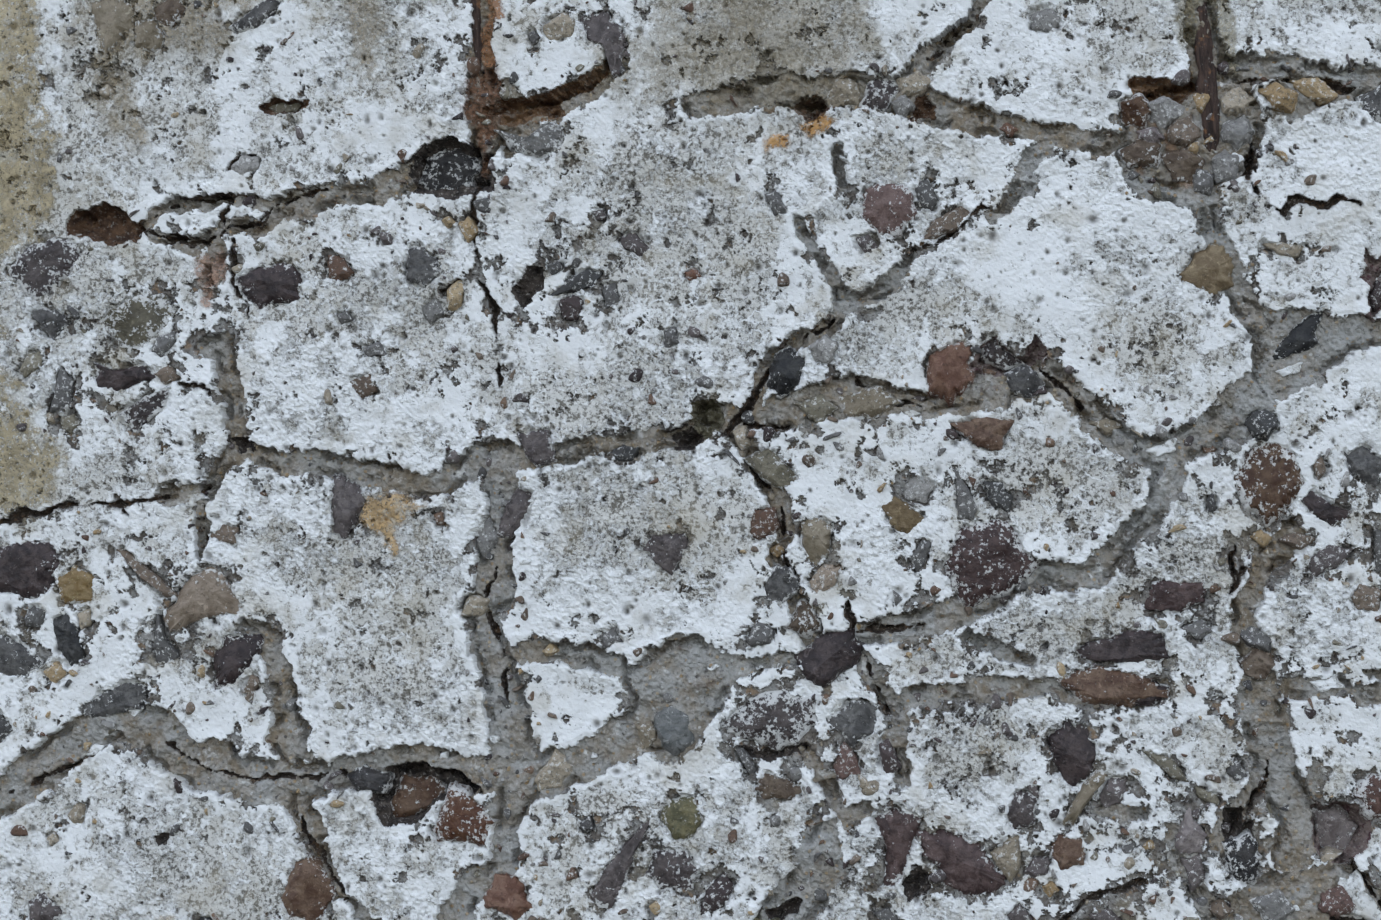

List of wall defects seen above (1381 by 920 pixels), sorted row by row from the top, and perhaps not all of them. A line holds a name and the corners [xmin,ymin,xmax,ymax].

corrosion [463,0,505,177]
crack [139,154,329,318]
crack [439,186,504,387]
crack [1240,142,1362,217]
crack [0,484,213,555]
crack [720,314,836,594]
flaking render [681,0,1381,789]
flaking render [0,331,823,920]
crack [844,600,926,717]
crack [166,741,348,784]
flaking render [748,746,882,920]
flaking render [1089,648,1381,920]